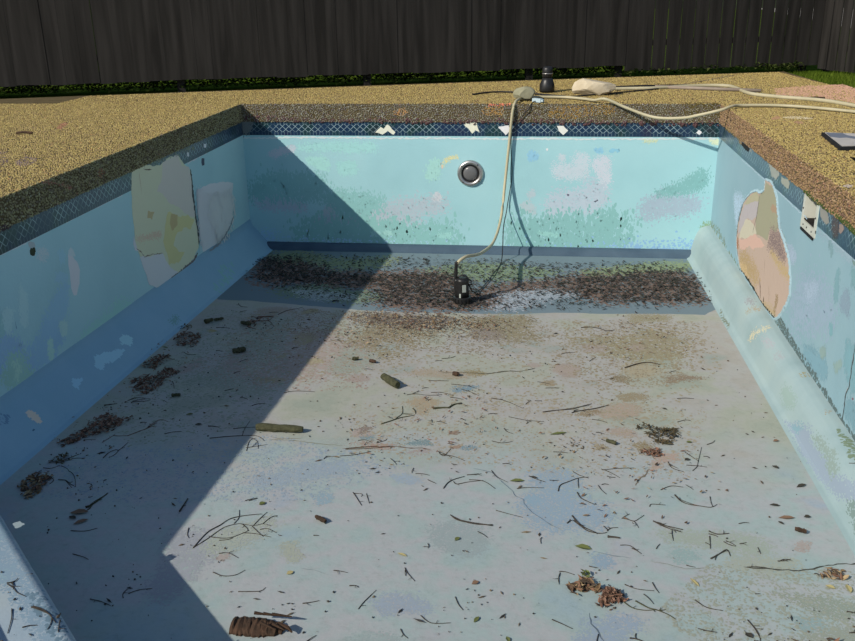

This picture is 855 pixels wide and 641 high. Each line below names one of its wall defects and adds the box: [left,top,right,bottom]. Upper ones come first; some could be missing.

spalling [131,152,199,288]
spalling [732,164,797,321]
crack [842,349,855,419]